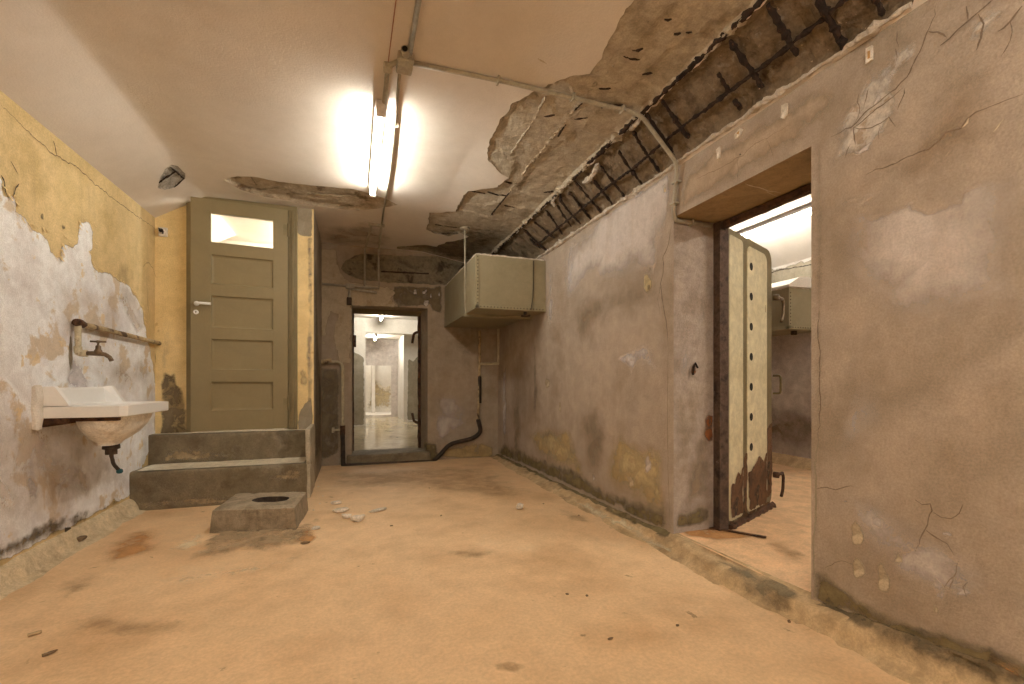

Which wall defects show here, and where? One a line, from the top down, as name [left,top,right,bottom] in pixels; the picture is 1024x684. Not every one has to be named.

spalling [490,0,914,259]
crack [831,0,1022,157]
crack [870,95,1020,173]
peeling [0,178,155,560]
damp [0,515,87,556]
damp [425,373,708,537]
rust [705,416,713,441]
rust [685,424,776,539]
crack [915,500,967,598]